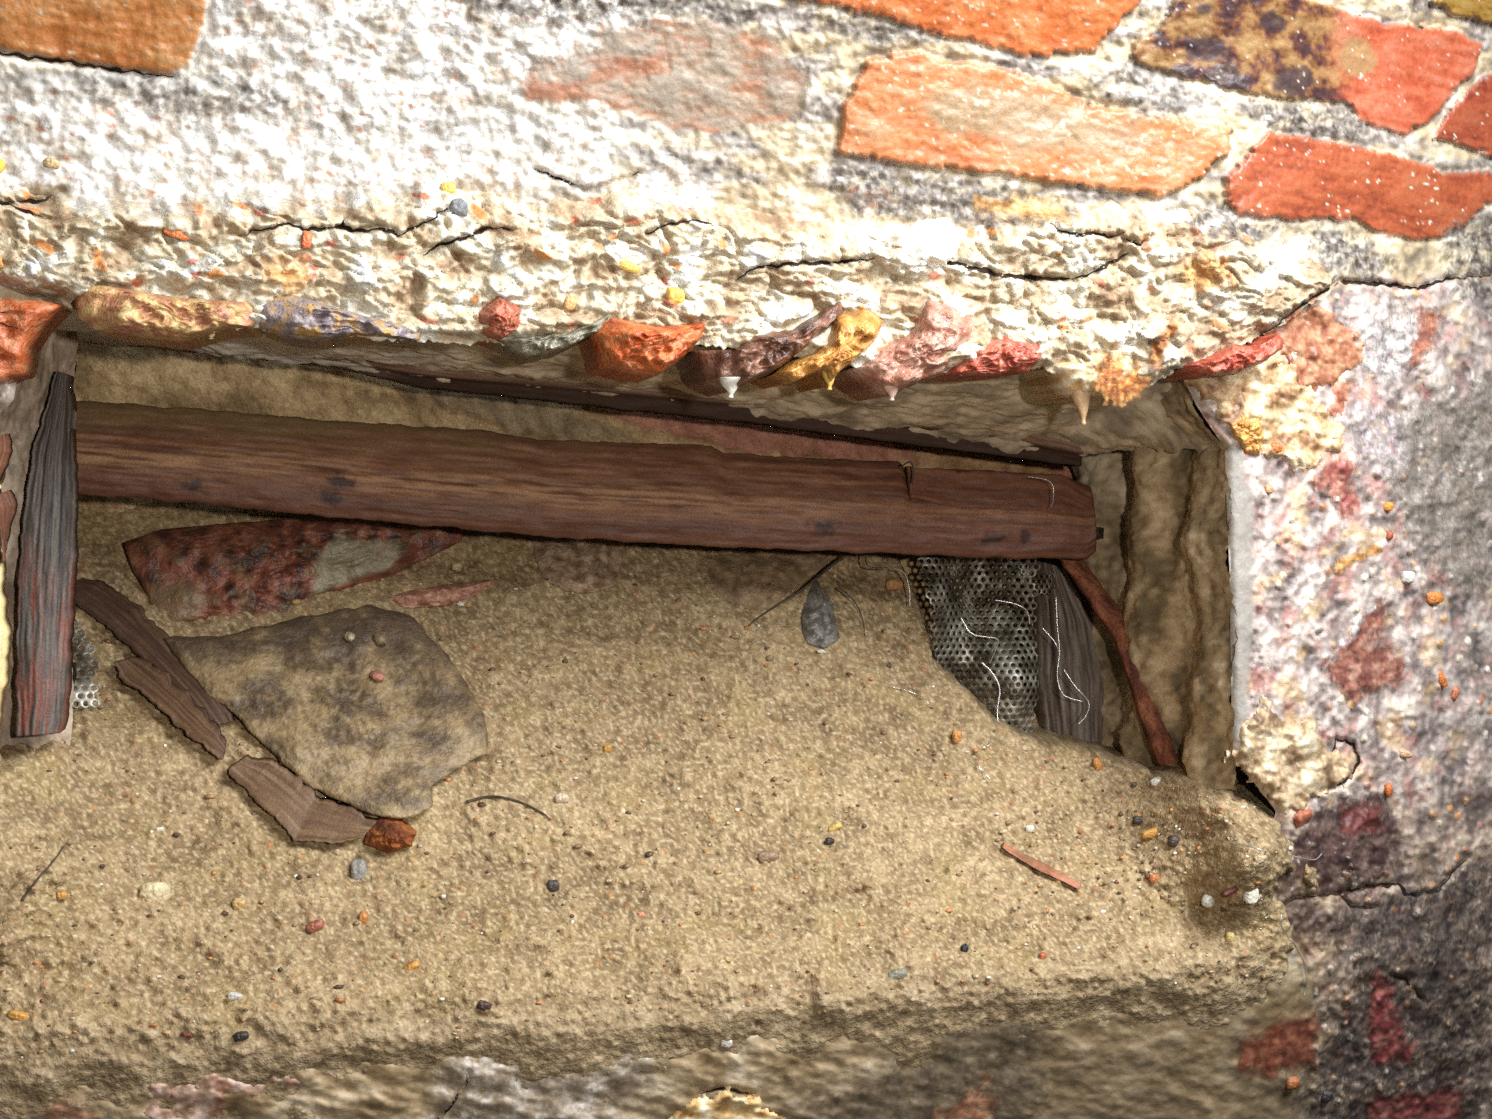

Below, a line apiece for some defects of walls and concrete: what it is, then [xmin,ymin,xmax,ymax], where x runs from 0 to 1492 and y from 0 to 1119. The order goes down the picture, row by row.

crack [0,195,51,219]
crack [238,207,510,255]
crack [537,170,575,185]
crack [645,219,712,234]
crack [737,258,874,280]
crack [947,223,1145,281]
spalling [0,182,1366,518]
spalling [1411,309,1442,369]
peeling [0,434,18,563]
spalling [124,517,464,622]
spalling [1224,696,1353,828]
water stain [1277,791,1492,1119]